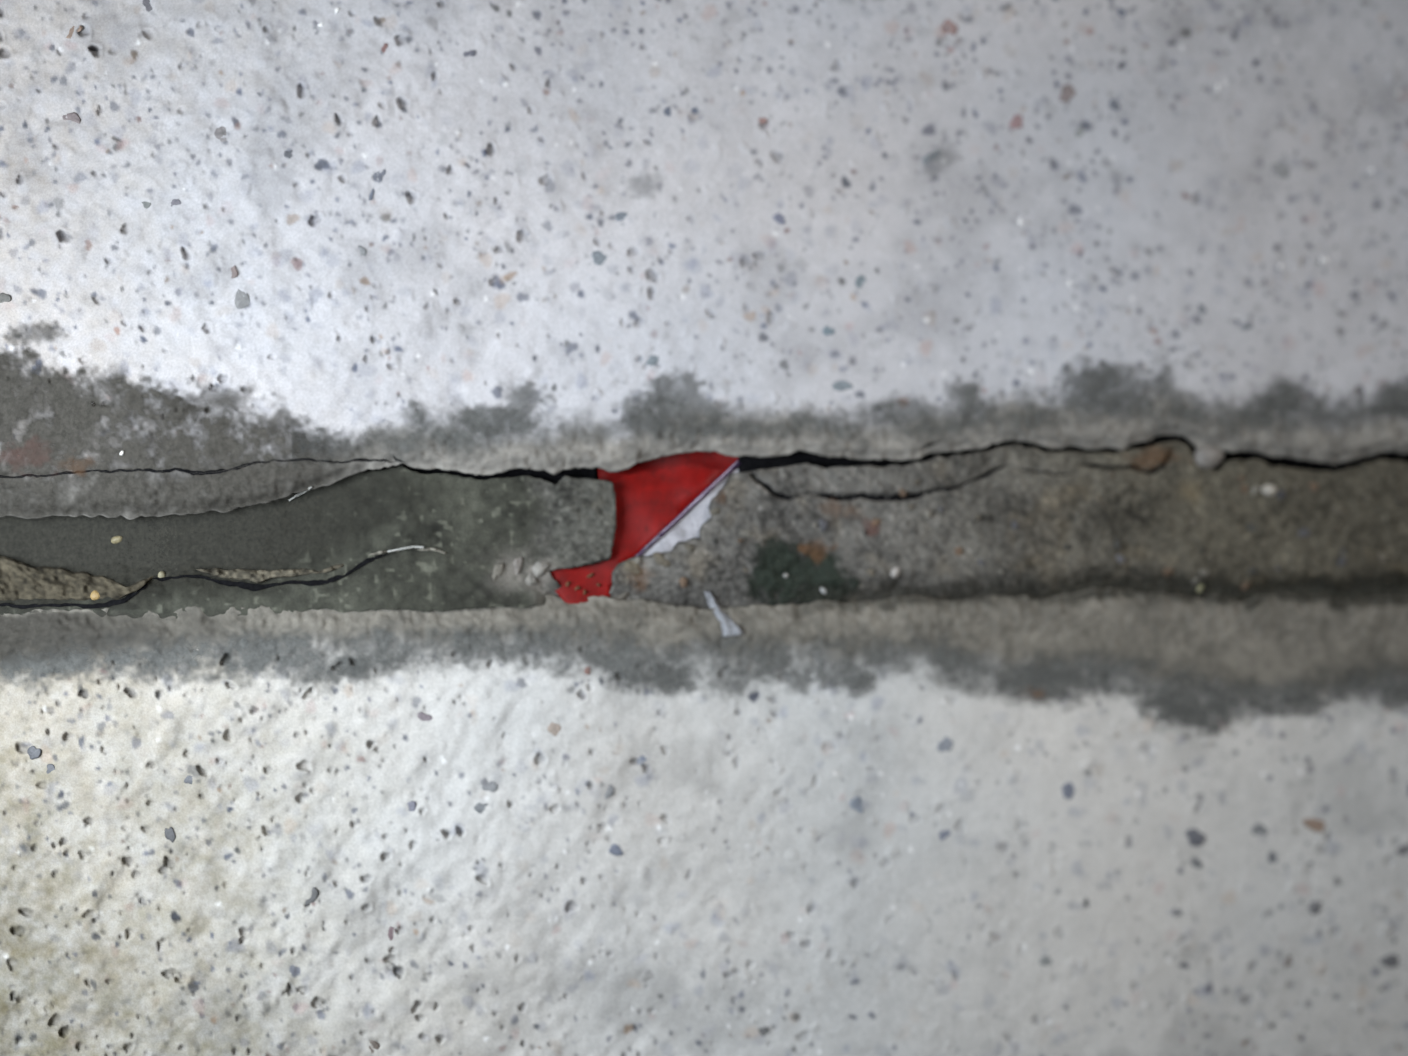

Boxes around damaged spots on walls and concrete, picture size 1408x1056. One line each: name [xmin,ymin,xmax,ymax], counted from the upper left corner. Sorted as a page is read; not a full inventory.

water stain [37,325,52,339]
water stain [0,330,542,518]
water stain [624,358,1408,438]
crack [0,455,599,485]
crack [738,435,1408,501]
crack [0,554,388,609]
spalling [492,557,549,586]
water stain [1069,571,1408,610]
water stain [0,613,1408,734]